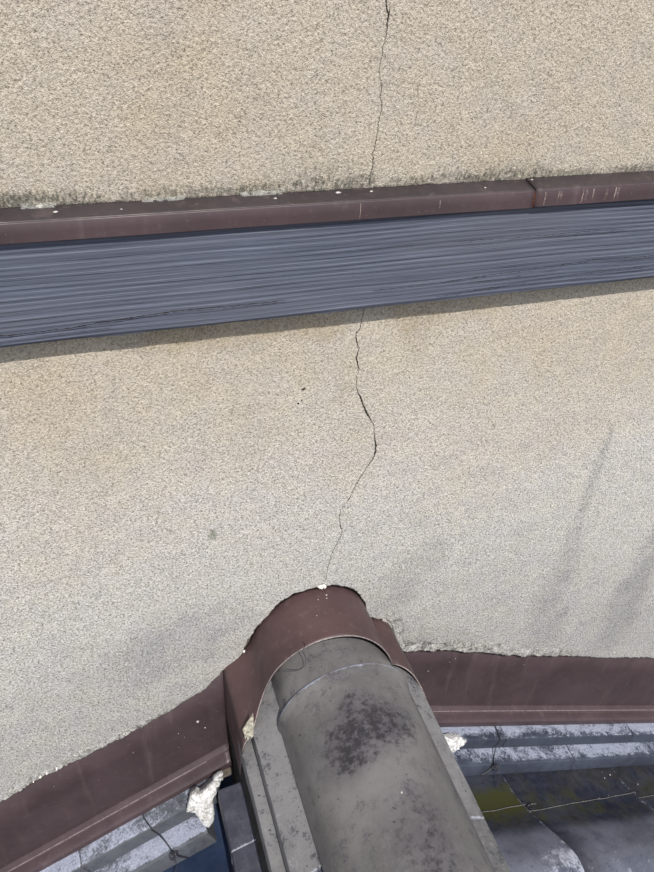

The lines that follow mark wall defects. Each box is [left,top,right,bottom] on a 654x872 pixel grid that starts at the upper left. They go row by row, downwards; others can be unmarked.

crack [369,0,391,183]
crack [372,255,654,297]
crack [316,311,377,589]